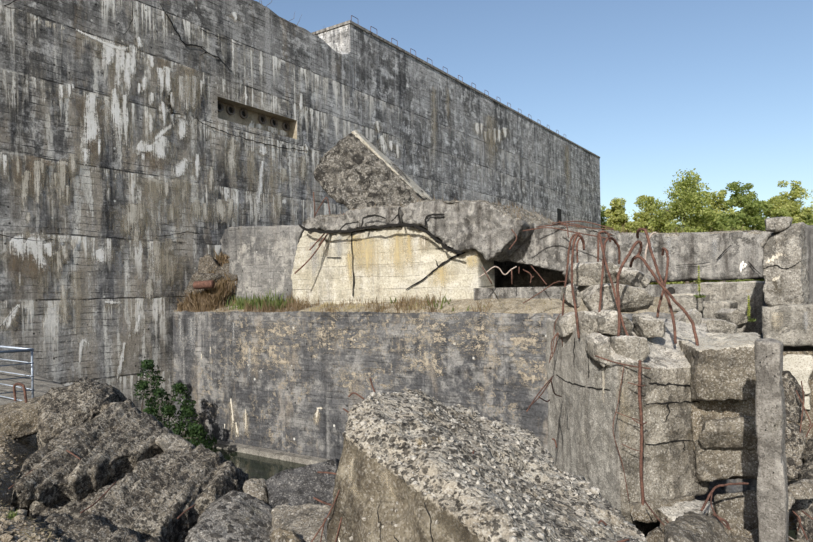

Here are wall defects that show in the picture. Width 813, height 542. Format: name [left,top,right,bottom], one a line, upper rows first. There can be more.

crack [160,4,242,72]
water stain [0,29,237,330]
crack [299,207,466,296]
crack [748,261,801,274]